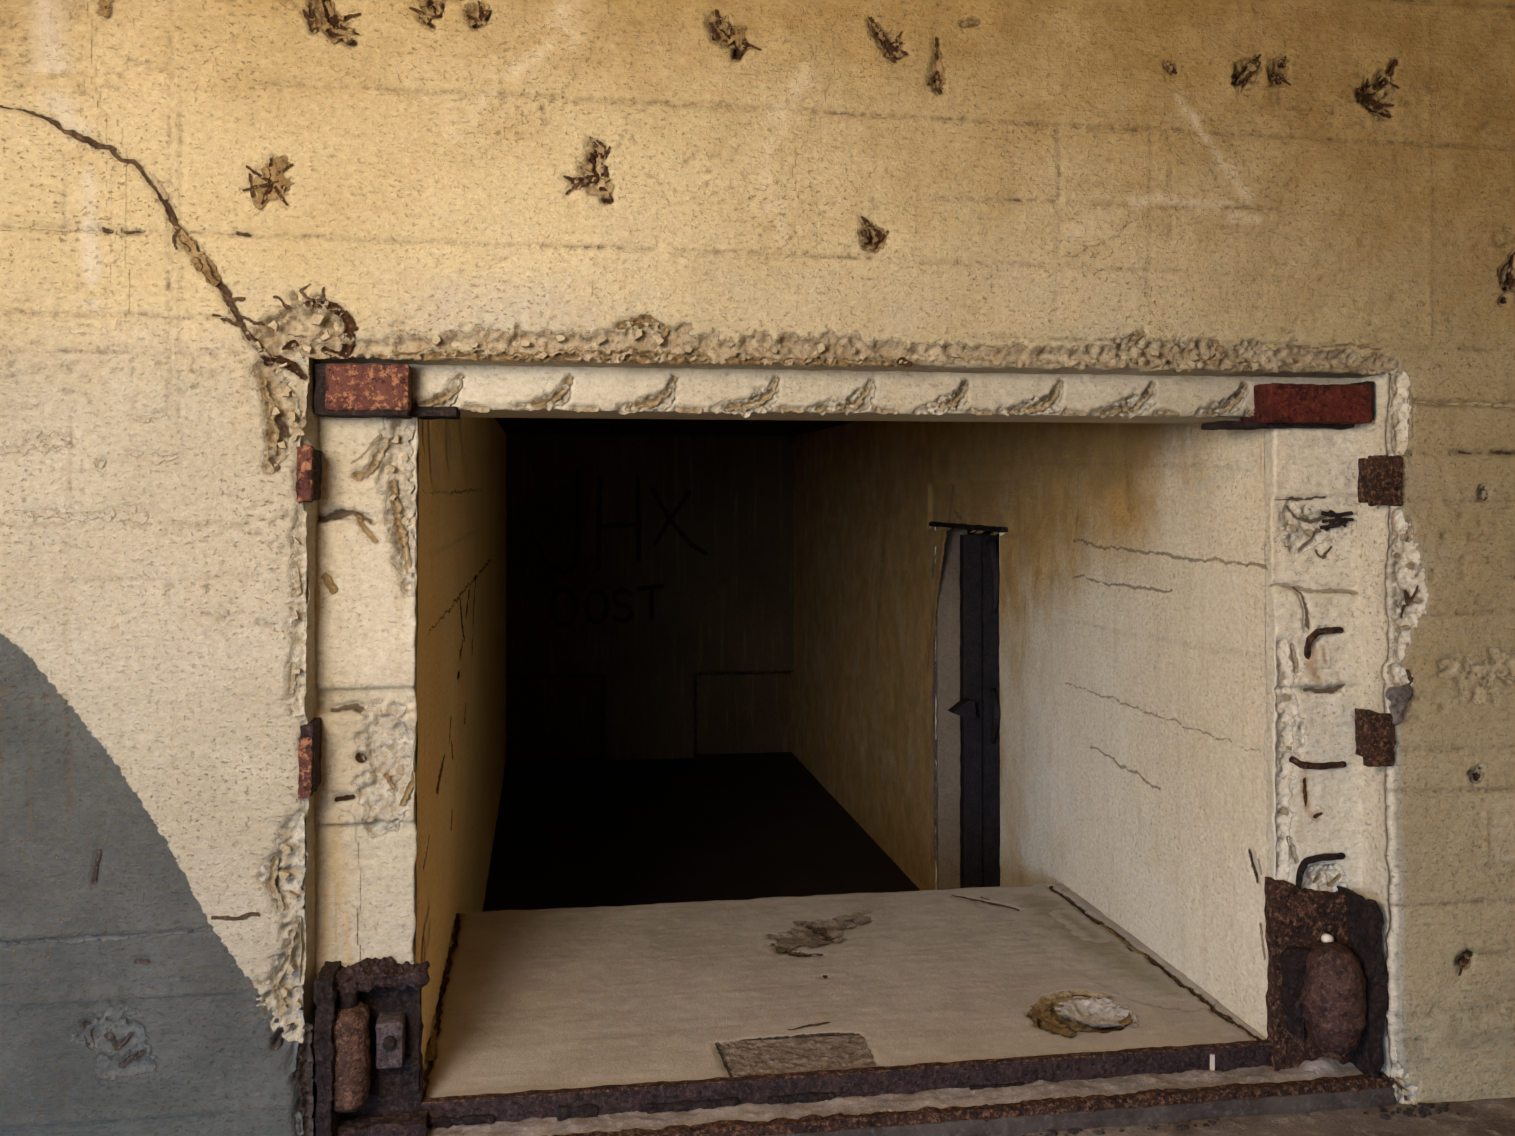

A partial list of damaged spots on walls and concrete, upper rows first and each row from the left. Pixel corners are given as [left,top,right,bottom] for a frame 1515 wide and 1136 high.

crack [0,105,263,352]
crack [242,163,293,208]
spalling [308,0,356,46]
spalling [571,140,613,204]
spalling [1357,59,1398,118]
spalling [241,284,1413,596]
spalling [283,511,307,717]
spalling [1385,509,1432,725]
spalling [1248,638,1347,892]